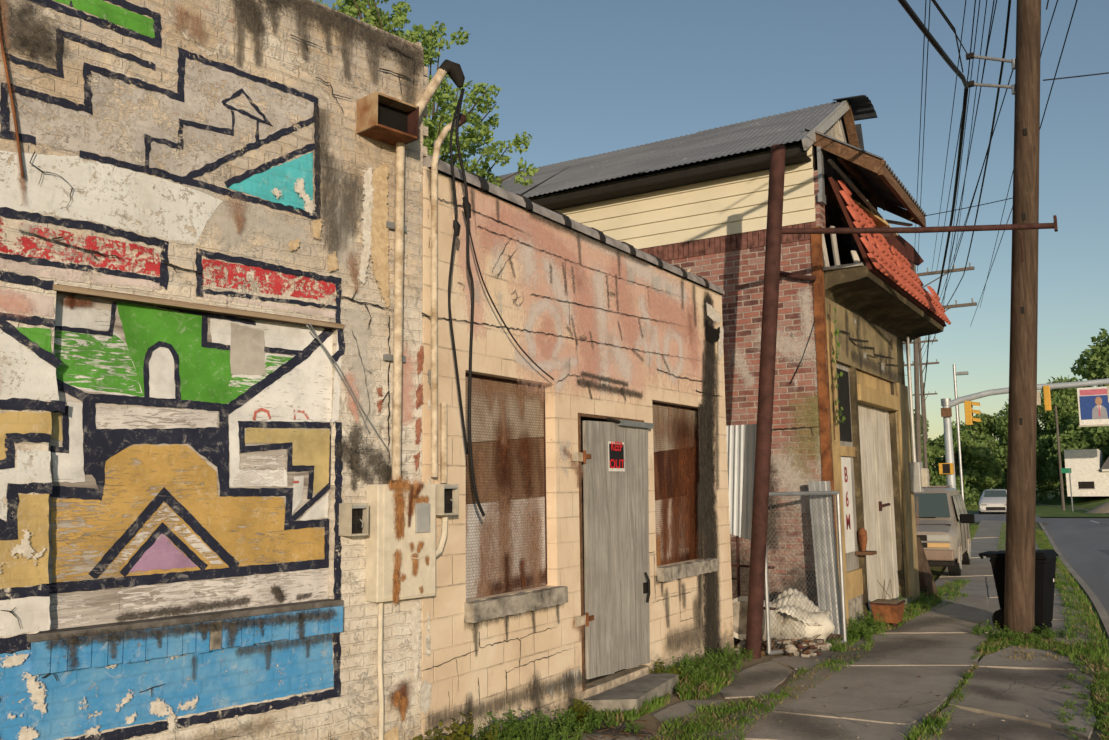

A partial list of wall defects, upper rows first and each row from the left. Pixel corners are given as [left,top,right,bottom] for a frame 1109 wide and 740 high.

water stain [234,0,424,105]
crack [29,152,84,210]
crack [19,230,122,259]
peeling [172,163,390,311]
water stain [531,213,649,276]
rust [472,379,546,597]
rust [656,406,702,566]
water stain [656,279,750,658]
water stain [764,565,817,604]
peeling [0,652,48,740]
peeling [150,694,198,735]
rust [392,683,409,722]